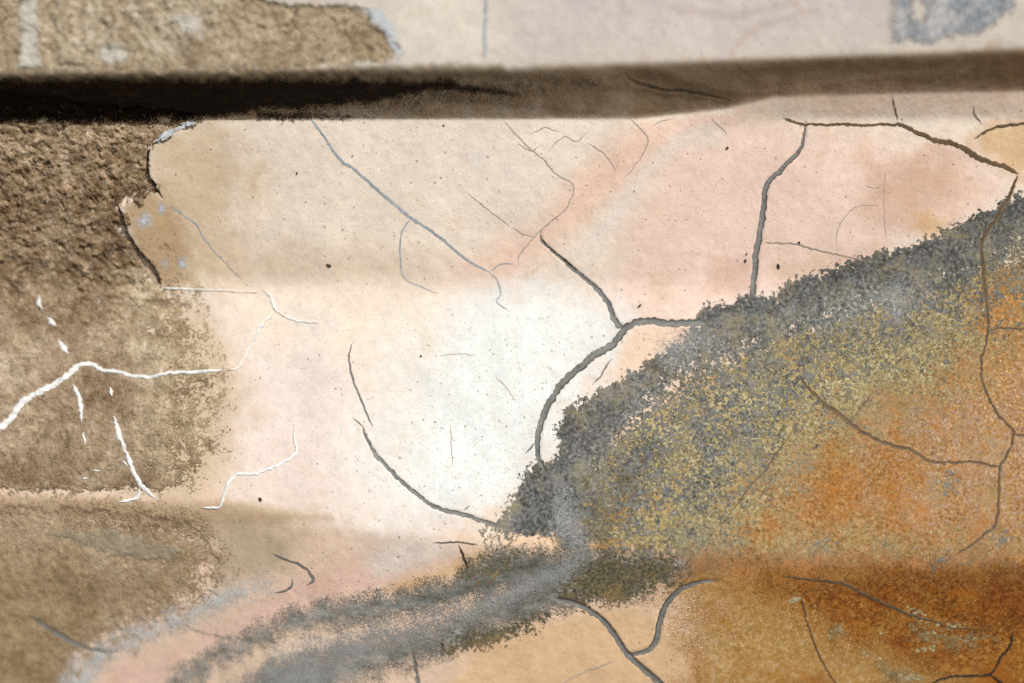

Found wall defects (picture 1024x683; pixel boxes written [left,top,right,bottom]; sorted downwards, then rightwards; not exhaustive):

flaking render [0,0,405,74]
crack [625,73,731,134]
flaking render [0,106,280,683]
crack [348,341,500,570]
crack [311,118,708,470]
damp [163,190,1024,683]
rust [637,246,1024,683]
crack [750,97,1024,555]
crack [412,652,420,683]
crack [555,580,714,683]
crack [783,576,985,683]
crack [933,633,1013,683]